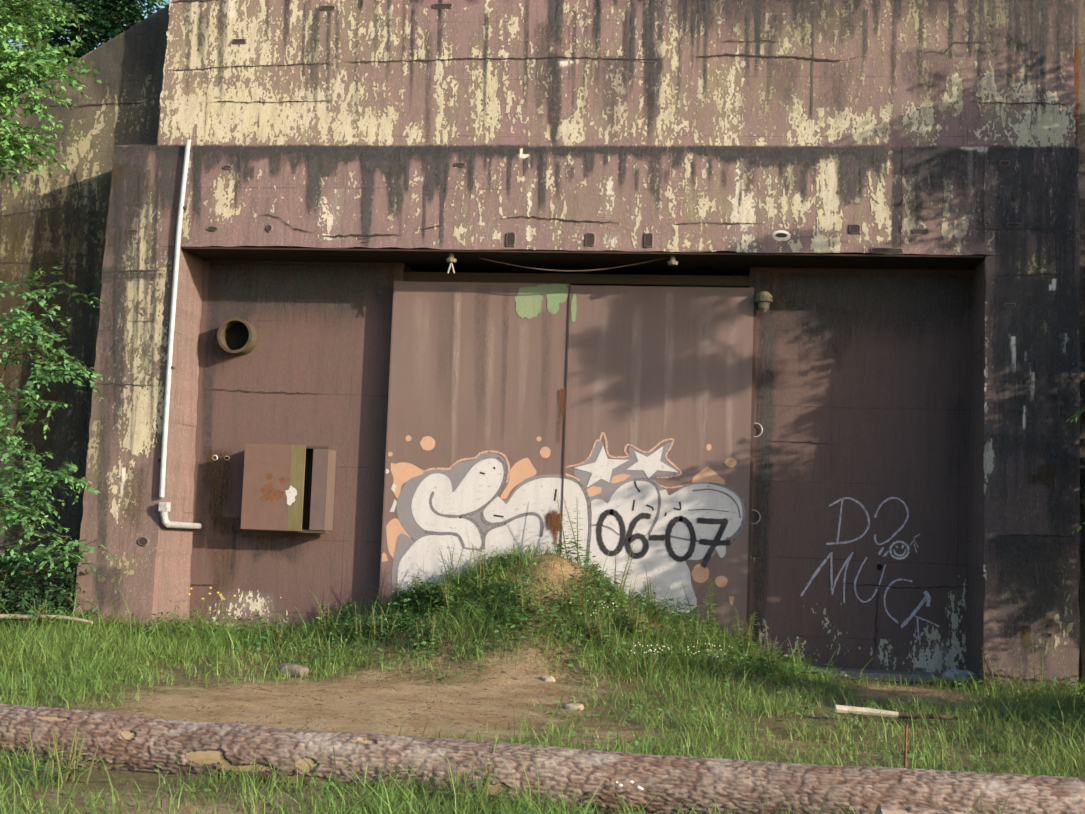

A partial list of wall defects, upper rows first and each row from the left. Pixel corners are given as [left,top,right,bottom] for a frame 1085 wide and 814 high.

crack [165,0,213,8]
crack [696,40,864,62]
crack [924,41,993,54]
crack [43,99,154,107]
crack [169,56,661,137]
crack [972,101,1068,139]
peeling [0,0,1079,528]
leakage [0,0,1085,634]
rust [546,511,562,544]
peeling [193,589,288,628]
peeling [757,618,769,650]
peeling [803,575,967,673]